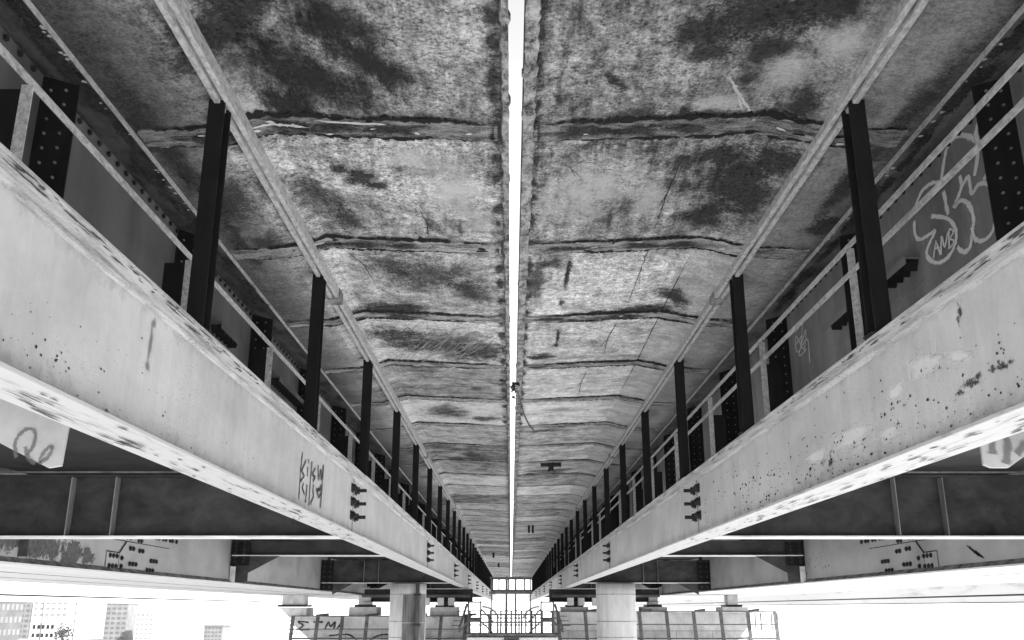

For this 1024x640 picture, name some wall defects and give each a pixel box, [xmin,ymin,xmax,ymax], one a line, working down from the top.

damp [162,28,210,96]
damp [192,0,415,92]
damp [665,0,871,122]
spalling [152,126,206,149]
damp [243,84,378,129]
spalling [245,110,496,142]
damp [604,90,736,120]
crack [629,155,685,299]
crack [619,252,692,395]